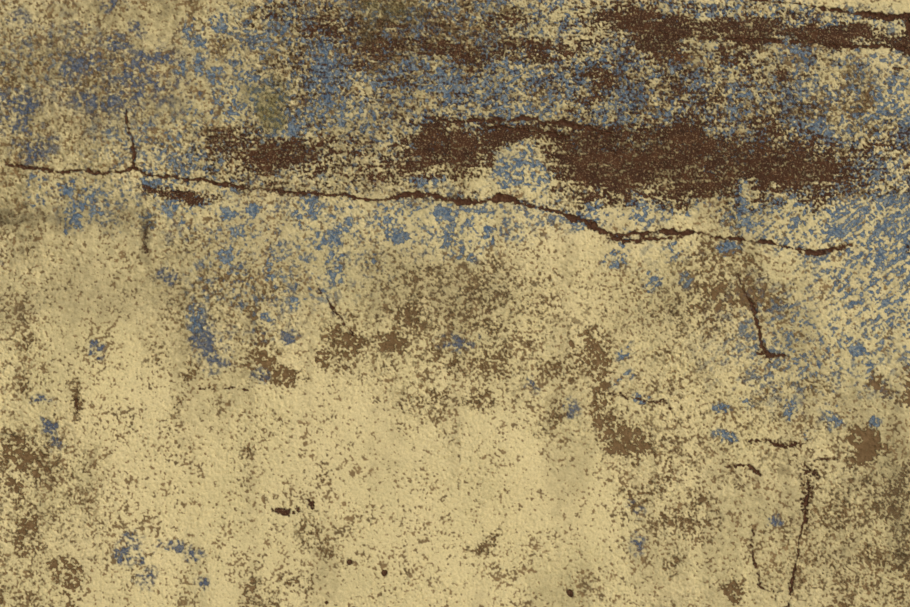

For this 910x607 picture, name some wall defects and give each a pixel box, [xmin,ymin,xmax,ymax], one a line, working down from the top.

crack [657,0,910,51]
crack [5,109,852,256]
crack [737,273,790,364]
crack [727,439,839,607]